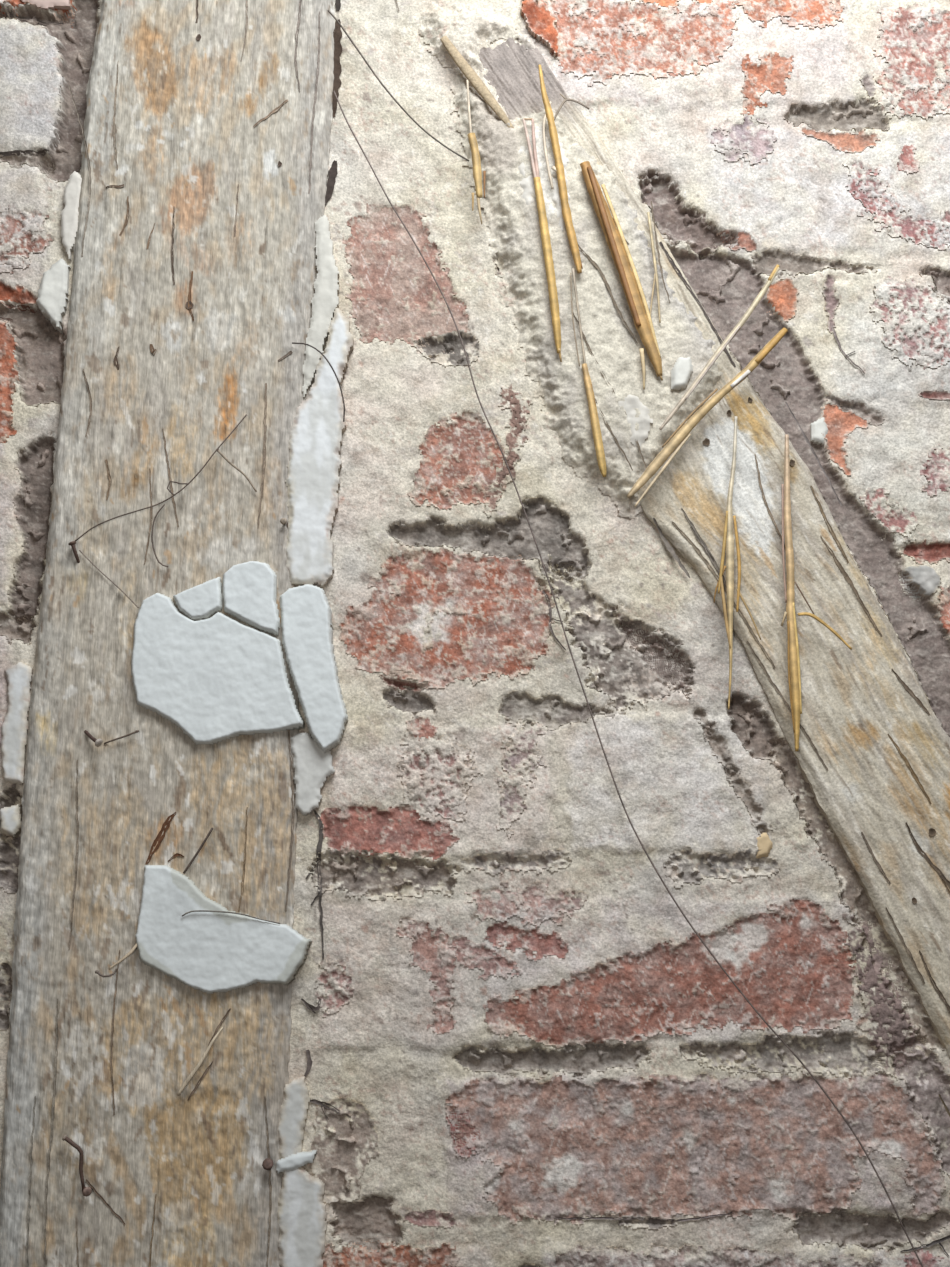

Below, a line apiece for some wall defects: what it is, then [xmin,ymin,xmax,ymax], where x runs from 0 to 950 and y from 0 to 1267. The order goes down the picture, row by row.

peeling [520,0,844,86]
peeling [710,52,794,165]
spalling [407,409,515,510]
spalling [339,547,555,693]
spalling [396,693,950,1227]
spalling [322,1209,463,1267]
peeling [551,1243,888,1267]
peeling [904,1248,944,1267]